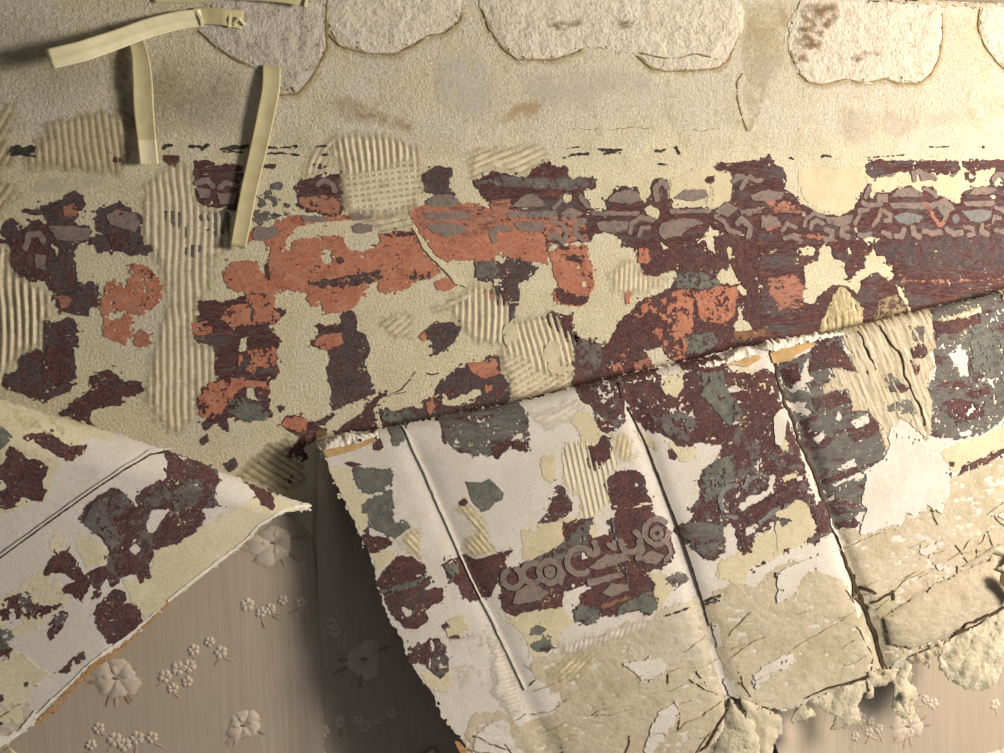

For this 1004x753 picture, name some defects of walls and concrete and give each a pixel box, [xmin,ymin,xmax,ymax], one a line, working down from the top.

peeling [0,191,164,427]
crack [388,372,439,396]
crack [0,450,169,559]
peeling [79,494,122,550]
peeling [536,517,594,565]
peeling [675,520,724,560]
peeling [700,454,737,503]
peeling [736,491,786,555]
crack [618,351,1004,753]
peeling [822,467,861,484]
crack [402,425,582,753]
peeling [572,592,658,626]